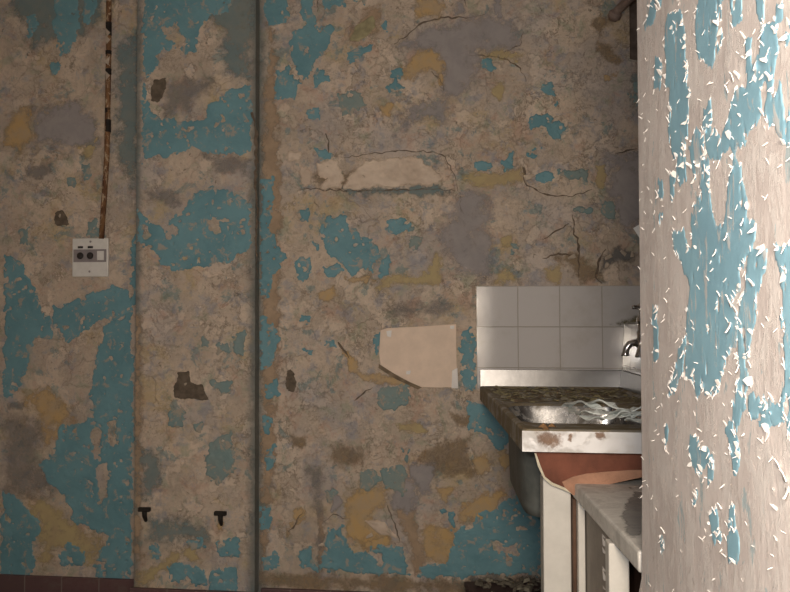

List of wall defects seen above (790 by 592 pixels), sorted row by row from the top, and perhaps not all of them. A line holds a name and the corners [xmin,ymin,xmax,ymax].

peeling [140,0,253,165]
peeling [263,0,388,100]
crack [395,0,485,44]
crack [305,133,464,214]
crack [520,167,606,283]
peeling [627,0,790,476]
peeling [0,175,392,579]
peeling [450,326,509,451]
peeling [687,428,714,507]
peeling [167,536,241,591]
peeling [298,493,541,580]
peeling [698,501,747,565]